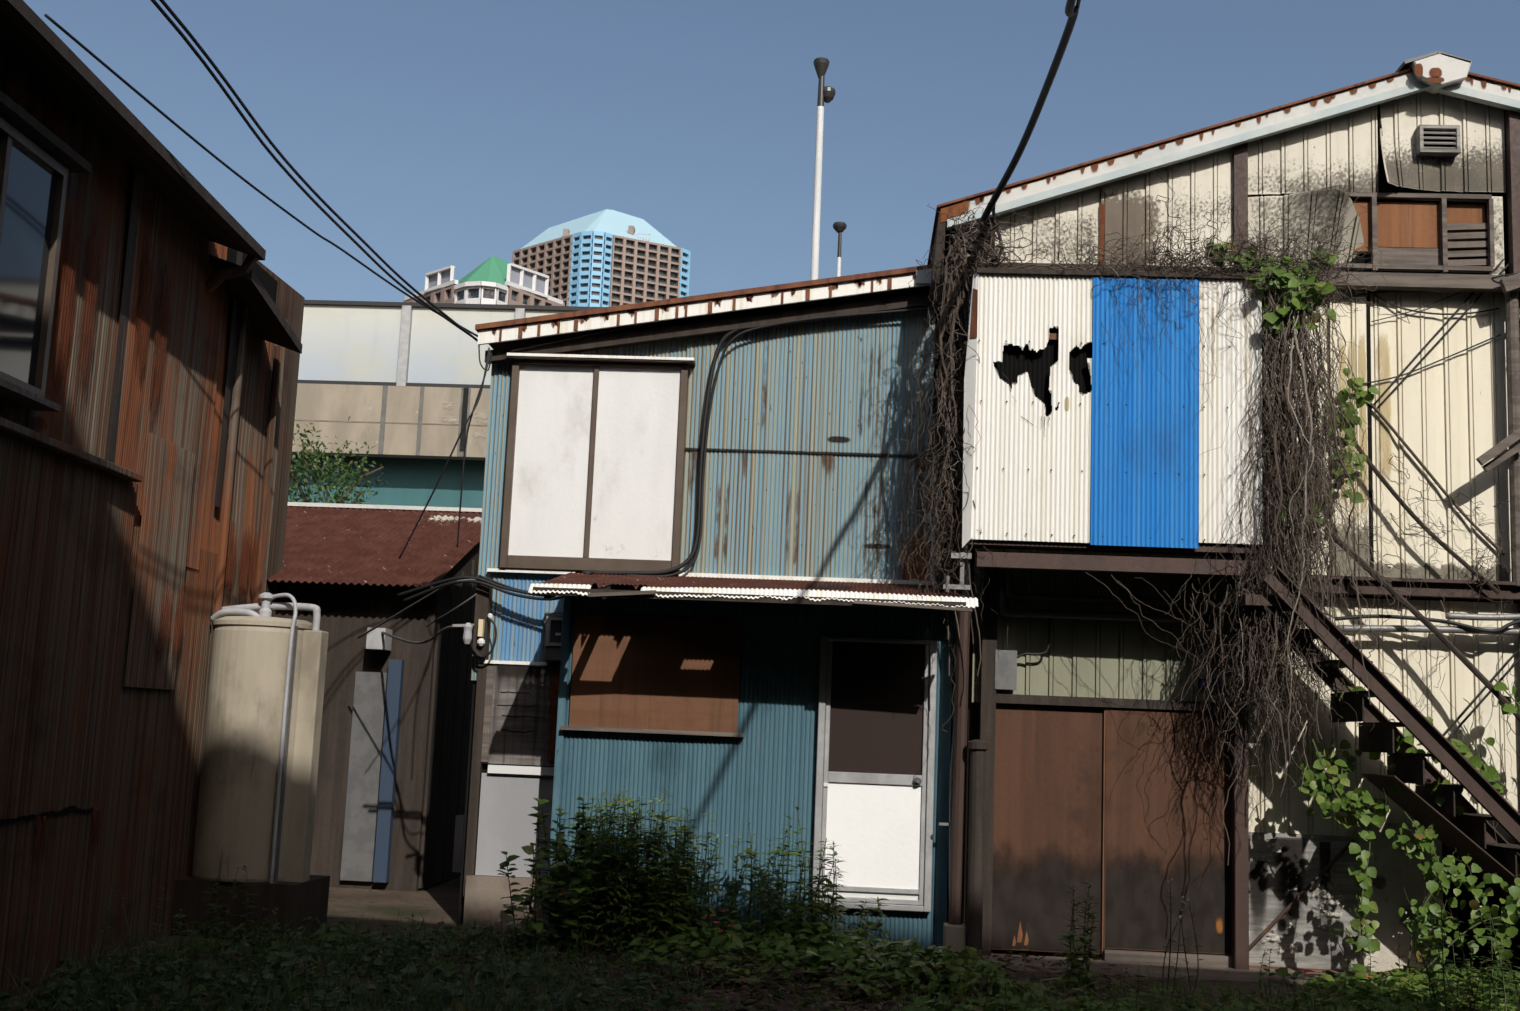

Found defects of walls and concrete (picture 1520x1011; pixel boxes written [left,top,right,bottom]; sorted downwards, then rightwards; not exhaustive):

rust [828,277,883,290]
rust [715,487,729,558]
rust [864,483,890,561]
rust [902,533,931,581]